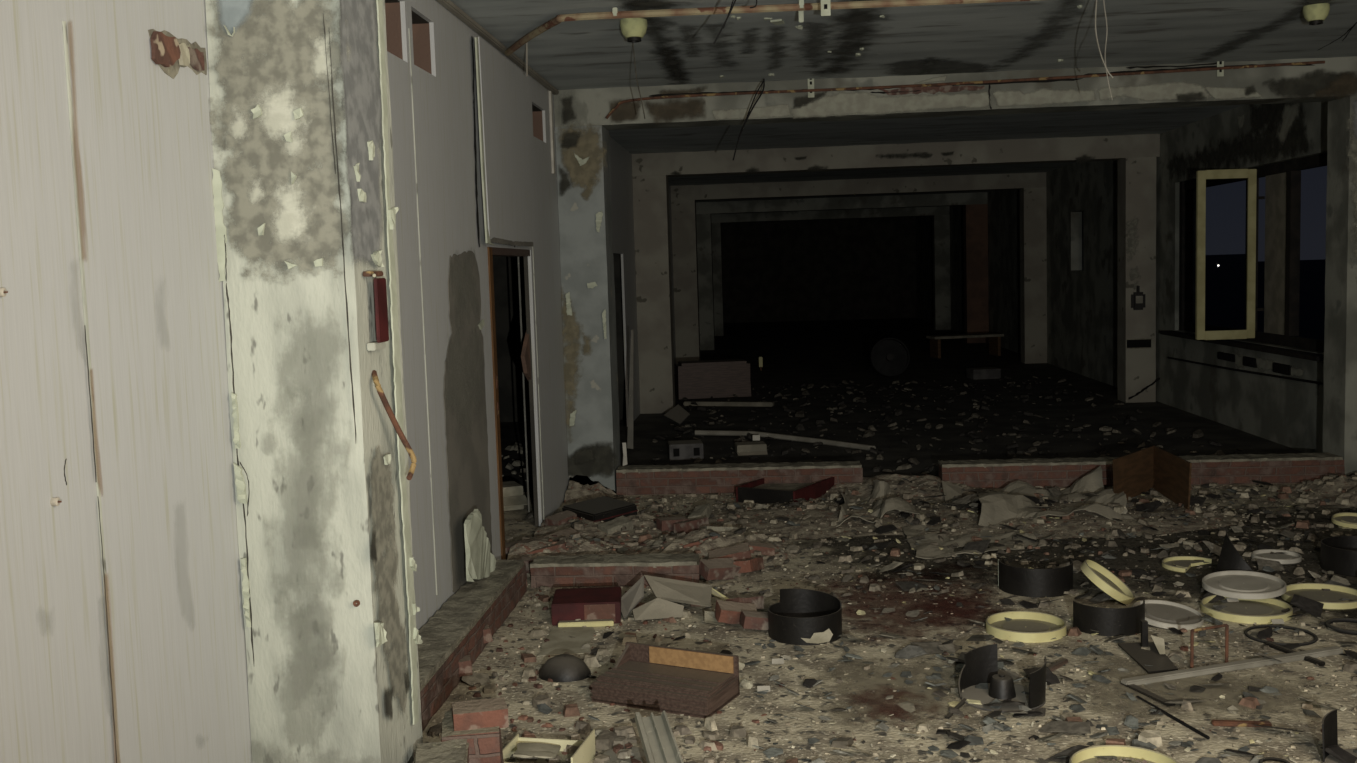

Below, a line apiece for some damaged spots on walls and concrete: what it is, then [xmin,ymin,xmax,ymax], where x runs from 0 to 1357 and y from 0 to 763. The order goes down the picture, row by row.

leakage [610,0,883,122]
leakage [891,0,1077,76]
spalling [532,104,543,141]
flaking render [560,126,606,200]
peeling [148,0,432,725]